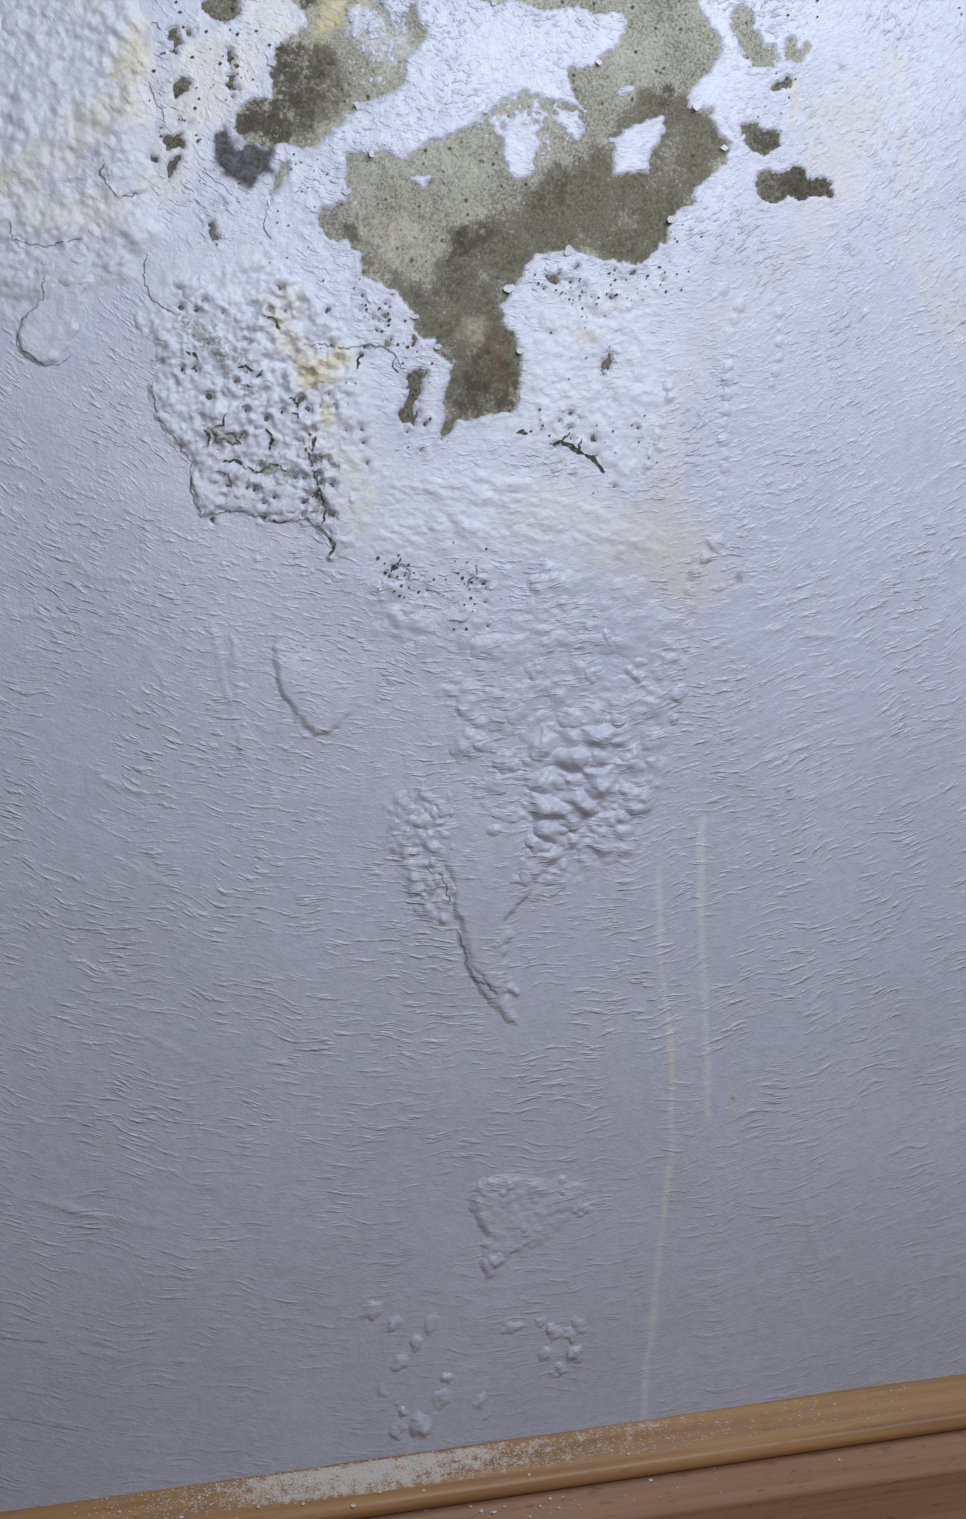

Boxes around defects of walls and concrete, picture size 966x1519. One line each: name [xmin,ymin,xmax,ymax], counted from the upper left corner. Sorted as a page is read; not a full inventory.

peeling [133,0,834,632]